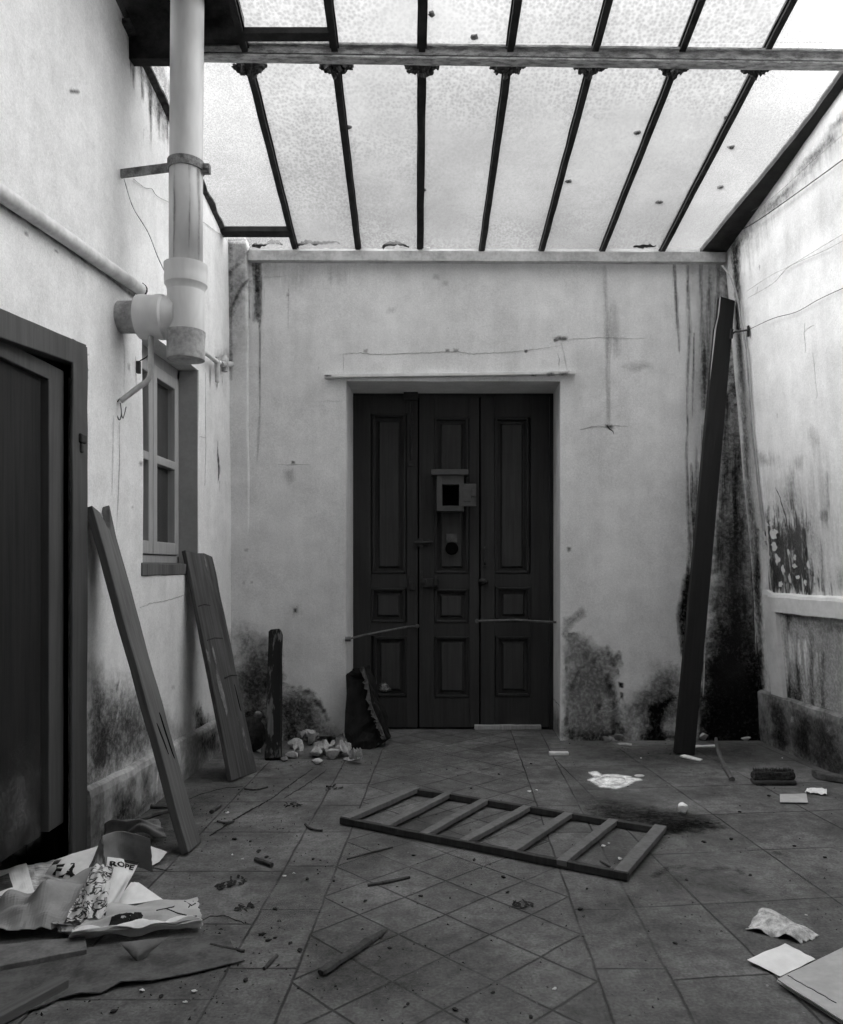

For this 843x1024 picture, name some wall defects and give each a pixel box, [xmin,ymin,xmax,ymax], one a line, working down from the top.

leakage [678,552,691,650]
leakage [698,386,843,768]
peeling [763,493,820,594]
leakage [195,708,219,755]
leakage [284,691,335,741]
leakage [641,684,678,741]